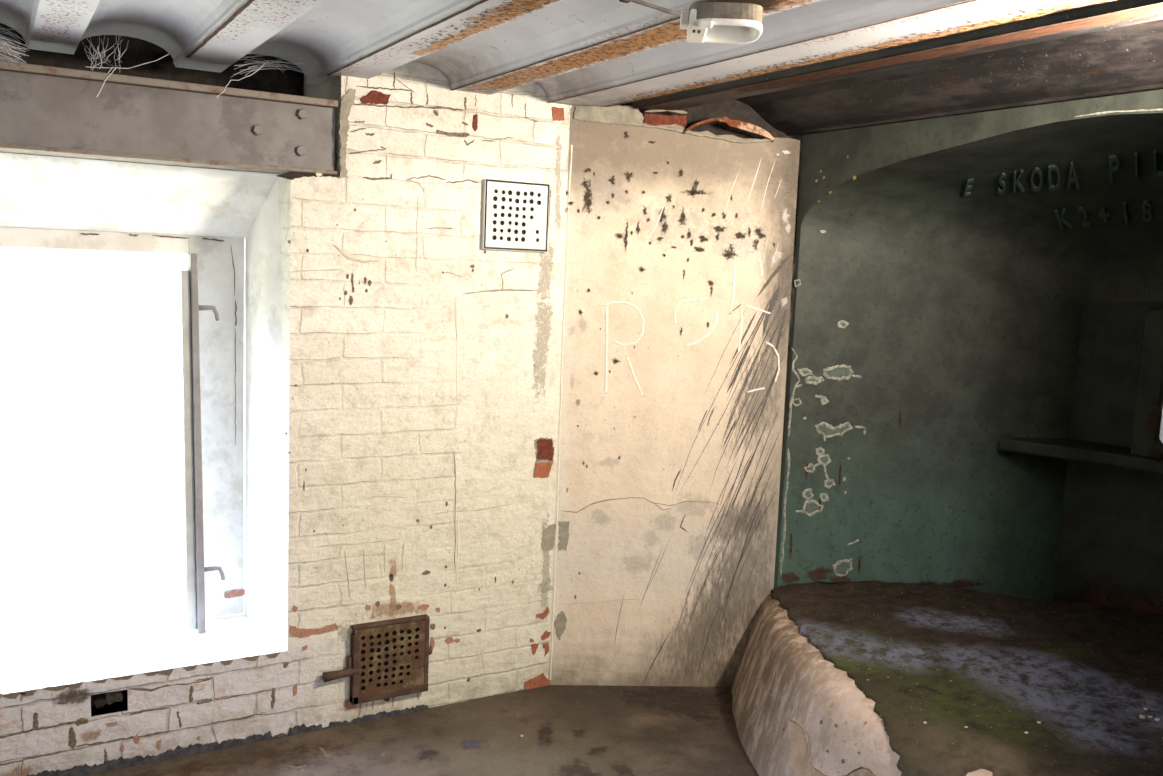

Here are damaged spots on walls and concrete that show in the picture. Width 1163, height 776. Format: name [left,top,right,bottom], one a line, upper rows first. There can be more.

rust [327,0,557,78]
rust [451,9,687,92]
rust [548,0,1163,109]
damp [548,136,600,228]
damp [615,179,775,279]
damp [533,244,554,394]
spalling [533,437,555,478]
damp [621,254,791,724]
peeling [780,348,866,577]
damp [540,522,552,608]
peeling [289,623,338,651]
spalling [0,652,280,716]